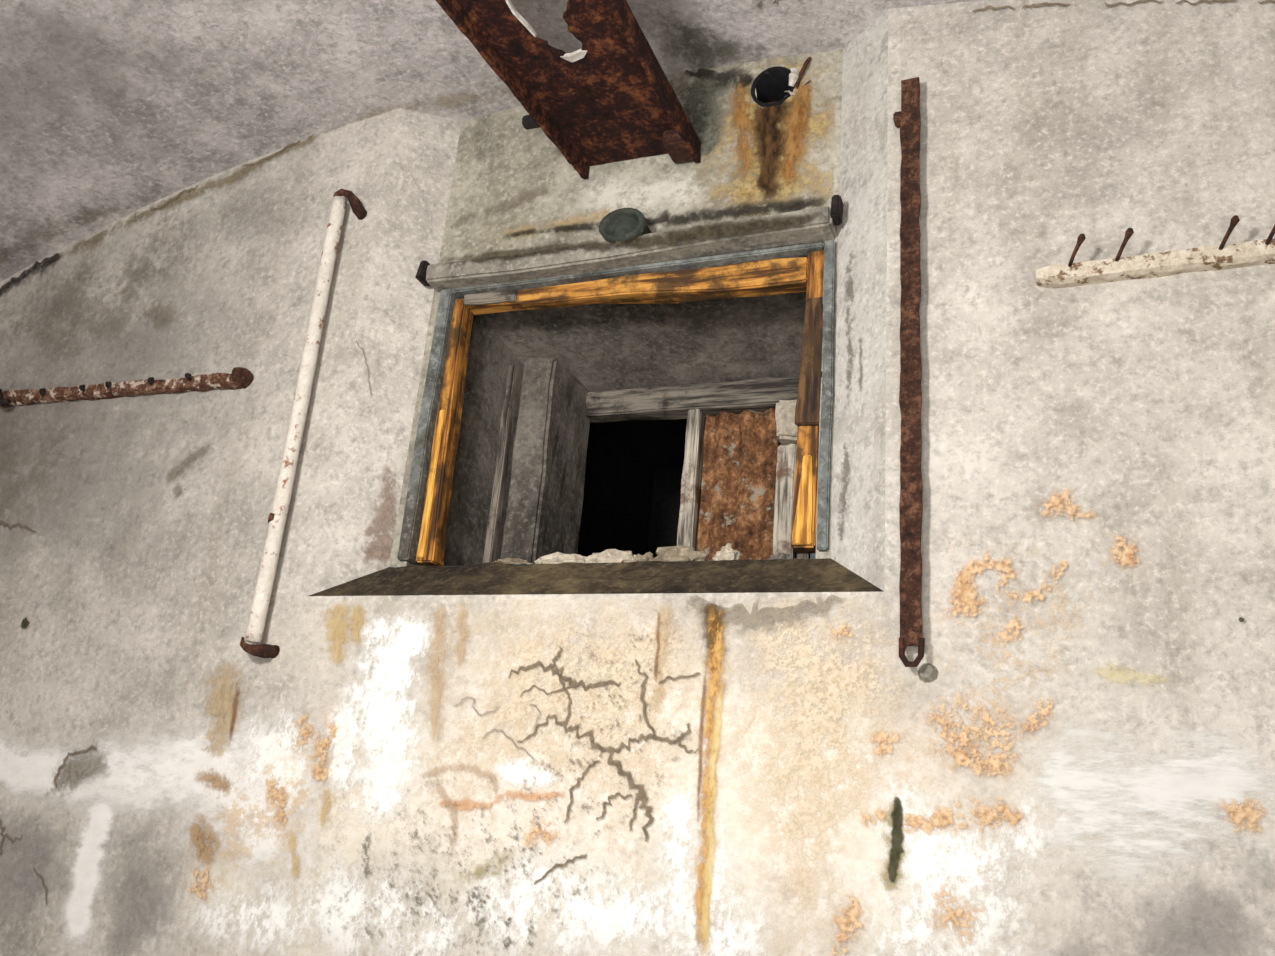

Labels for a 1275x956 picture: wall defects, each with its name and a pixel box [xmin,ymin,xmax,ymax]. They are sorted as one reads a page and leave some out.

corrosion [712,65,830,205]
damp [0,225,60,295]
damp [453,188,546,227]
damp [447,198,823,262]
corrosion [207,665,239,755]
peeling [53,745,105,791]
corrosion [199,773,229,791]
corrosion [439,791,563,810]
crack [454,647,700,841]
corrosion [695,604,724,942]
corrosion [524,821,557,847]
crack [534,854,587,885]